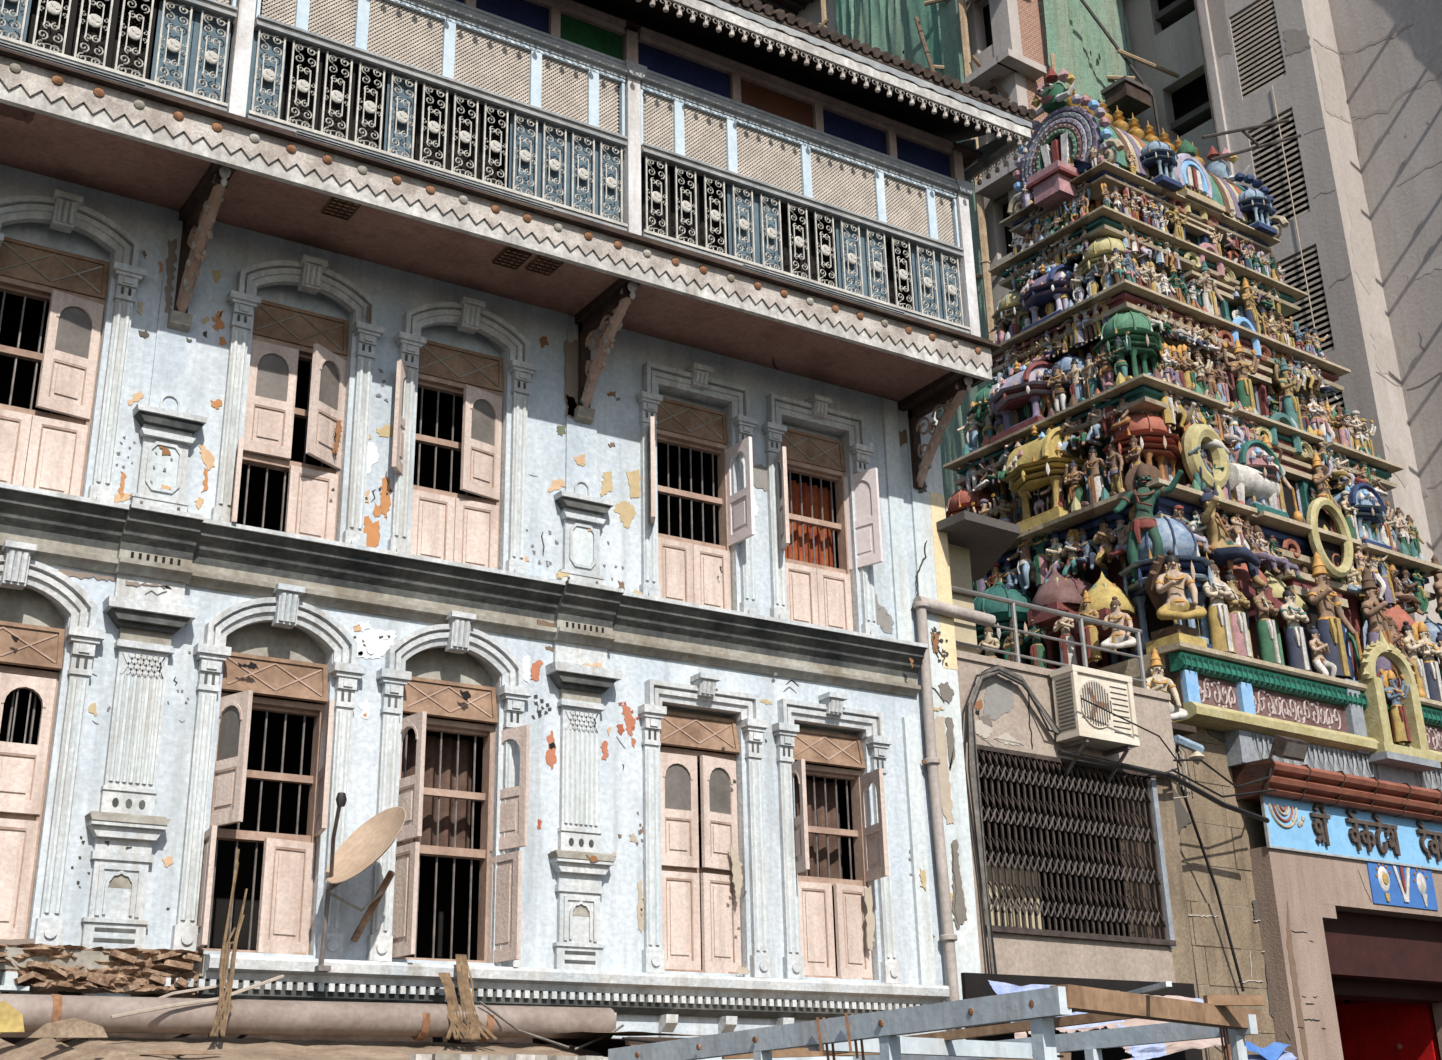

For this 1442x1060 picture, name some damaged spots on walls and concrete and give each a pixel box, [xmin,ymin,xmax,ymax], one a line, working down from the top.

peeling [194,443,215,510]
peeling [363,424,394,548]
peeling [548,479,565,493]
peeling [600,469,641,529]
peeling [353,621,397,659]
peeling [522,655,557,770]
peeling [601,702,639,760]